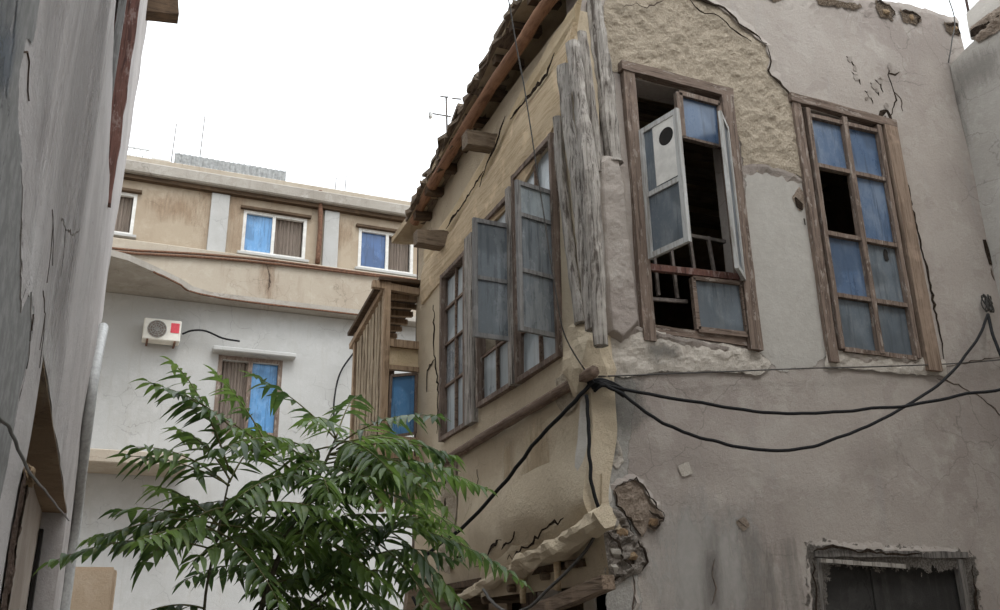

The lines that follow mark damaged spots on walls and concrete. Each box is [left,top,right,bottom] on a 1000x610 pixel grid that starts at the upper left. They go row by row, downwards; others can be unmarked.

spalling [816,0,862,10]
spalling [875,0,921,26]
crack [446,54,554,229]
flaking render [603,0,802,184]
crack [879,70,903,119]
peeling [0,0,40,498]
crack [19,209,80,398]
flaking render [656,332,730,351]
crack [908,185,1000,416]
crack [454,518,563,567]
spalling [604,439,667,585]
spalling [800,538,983,610]